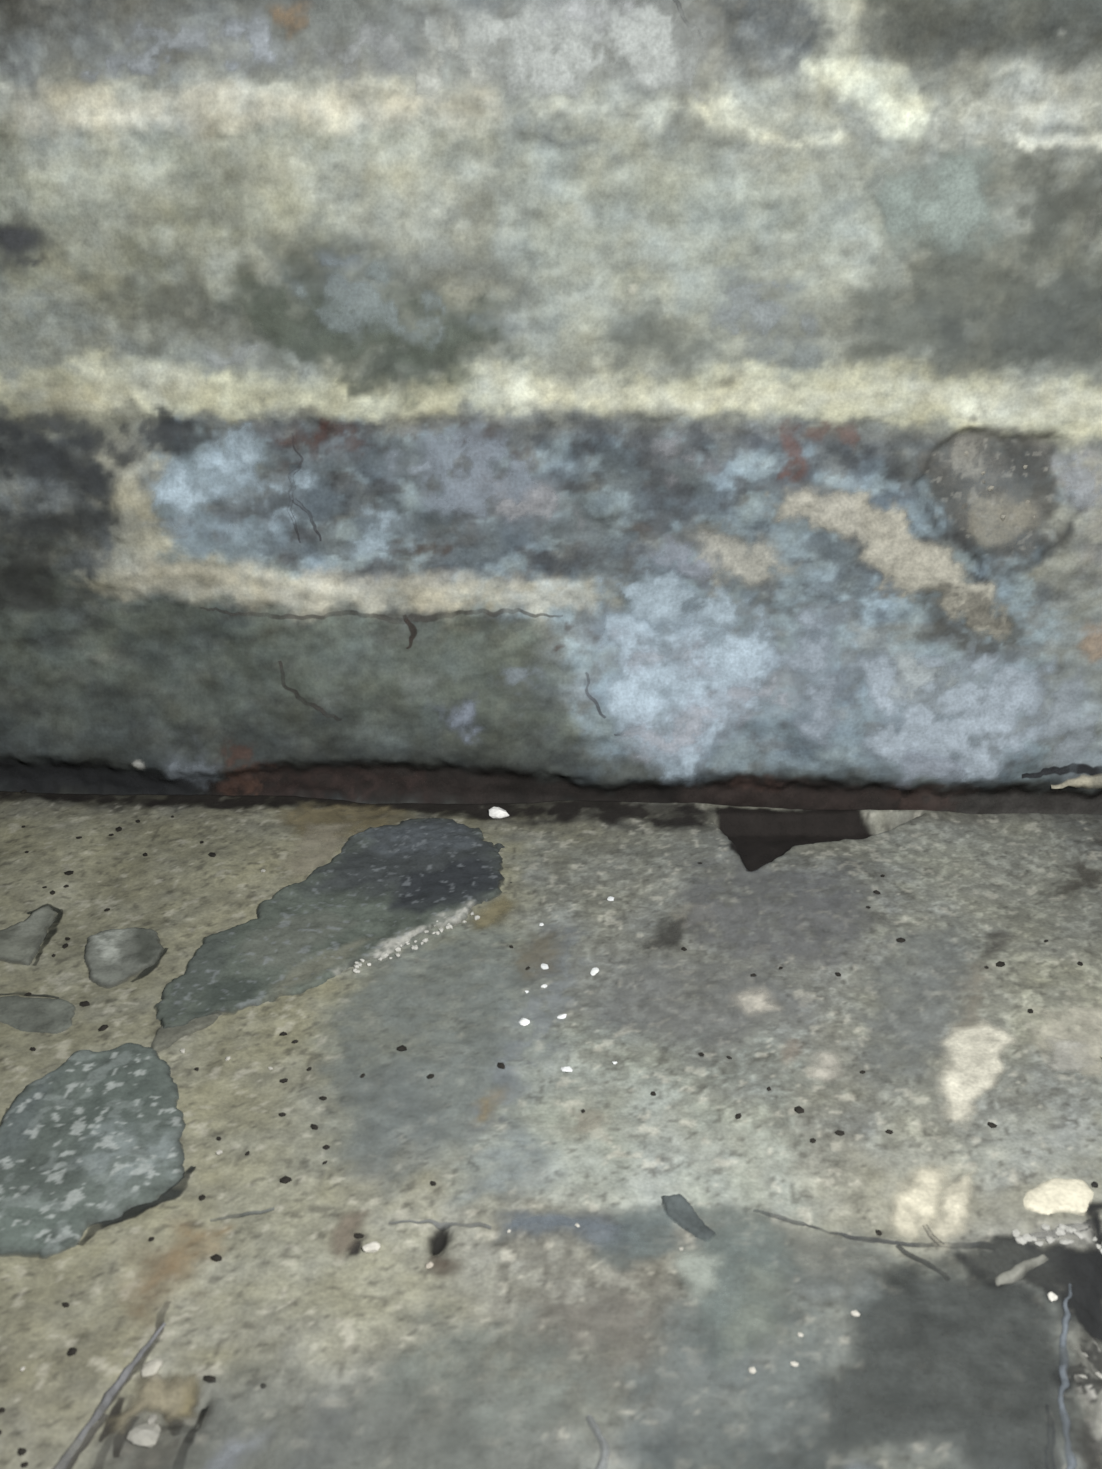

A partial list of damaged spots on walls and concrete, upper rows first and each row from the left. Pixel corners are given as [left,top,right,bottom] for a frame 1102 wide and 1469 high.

water stain [0,410,311,514]
spalling [919,429,1055,565]
crack [405,619,417,649]
crack [589,696,621,736]
water stain [604,532,838,781]
water stain [859,648,1096,782]
crack [0,759,1102,872]
peeling [0,818,512,1258]
spalling [99,1358,199,1469]
water stain [670,1214,1070,1469]
spalling [955,1181,1102,1469]
crack [1046,1288,1077,1469]